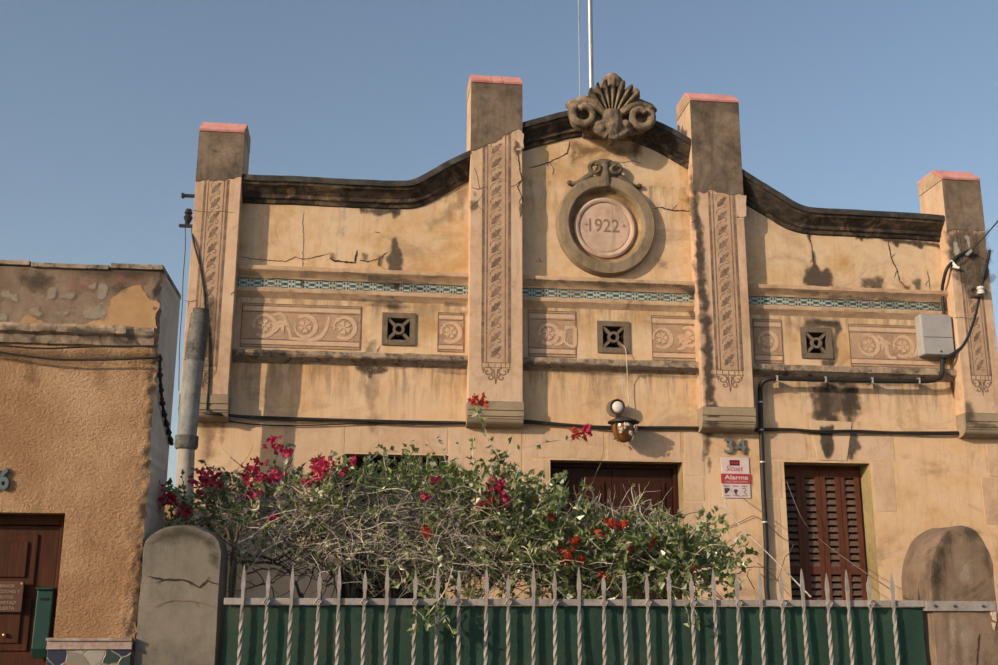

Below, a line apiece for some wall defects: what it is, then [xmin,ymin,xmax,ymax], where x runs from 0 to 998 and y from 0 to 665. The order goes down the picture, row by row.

crack [510,143,570,205]
crack [241,211,388,267]
damp [360,237,428,304]
damp [799,253,917,304]
crack [888,242,931,290]
peeling [56,283,160,331]
damp [526,175,719,464]
damp [793,319,921,459]
crack [148,576,218,608]